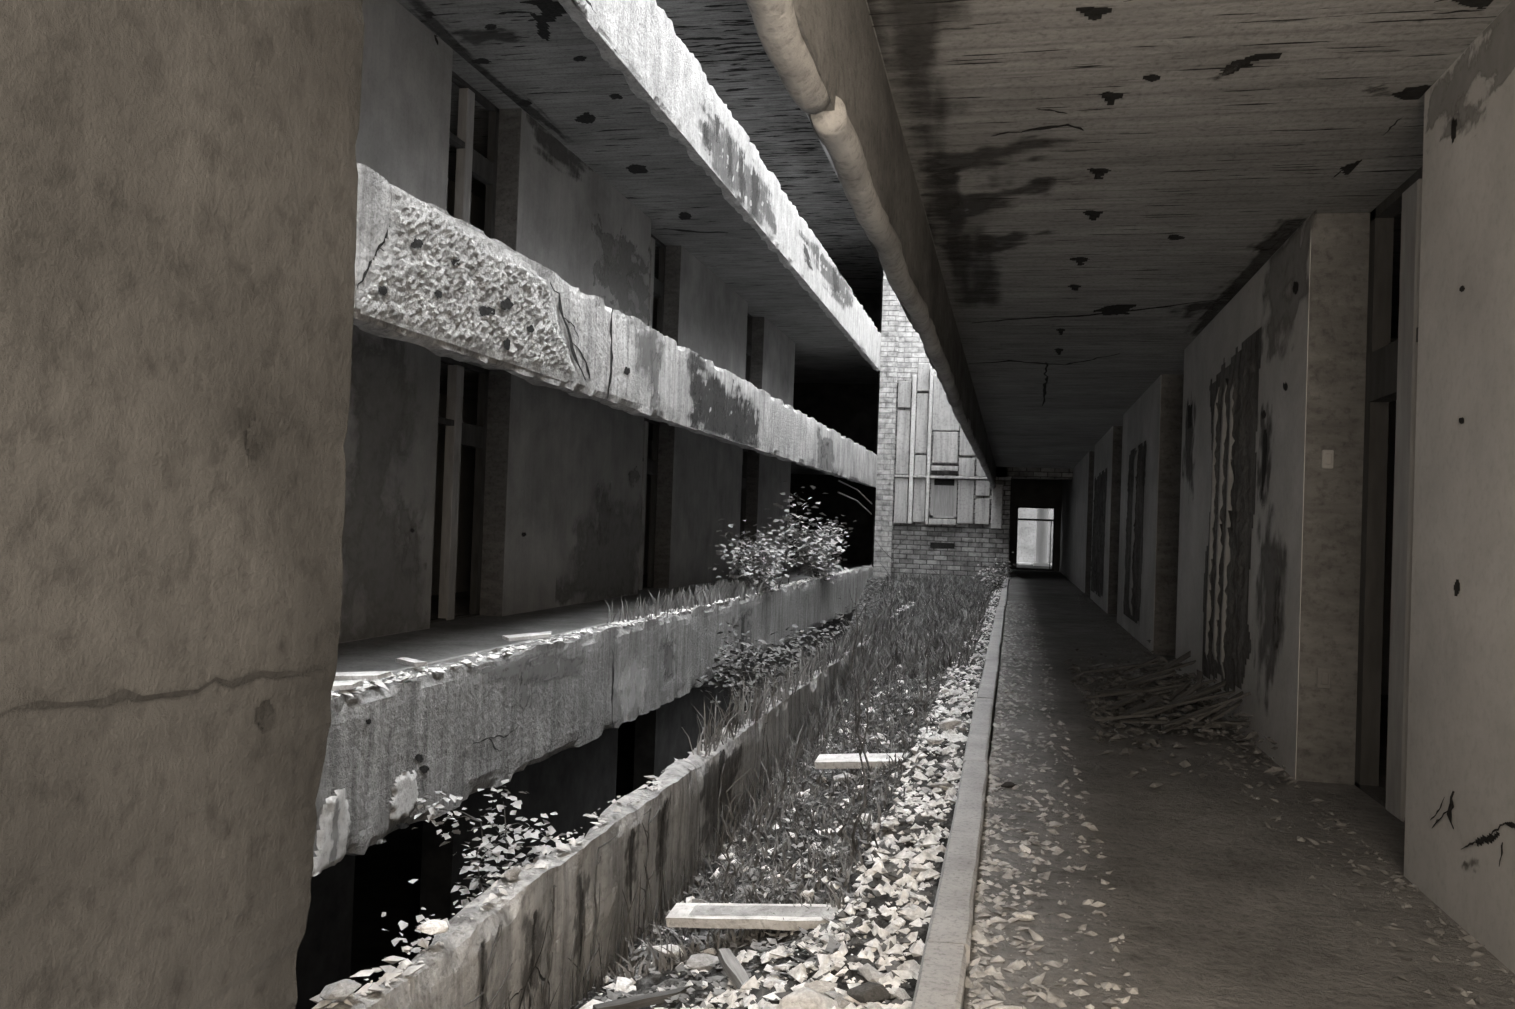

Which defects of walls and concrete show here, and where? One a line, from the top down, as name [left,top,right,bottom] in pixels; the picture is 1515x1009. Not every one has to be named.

leakage [699,107,777,234]
leakage [867,0,1062,304]
spalling [356,185,576,382]
leakage [799,230,854,310]
leakage [687,352,761,448]
leakage [1257,406,1272,505]
leakage [1256,526,1286,708]
peeling [312,787,351,877]
peeling [389,753,429,829]
spalling [1462,822,1515,868]